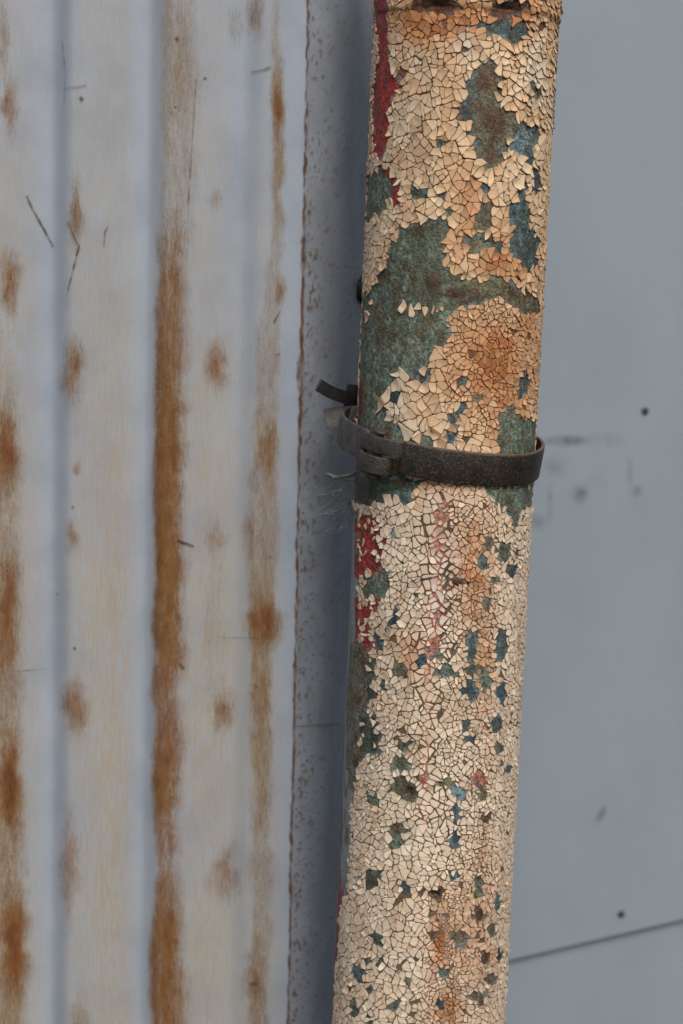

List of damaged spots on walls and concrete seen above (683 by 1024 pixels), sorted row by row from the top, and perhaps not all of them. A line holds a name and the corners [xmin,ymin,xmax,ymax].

corrosion [273,68,283,221]
peeling [354,0,550,454]
crack [357,0,564,454]
corrosion [0,733,22,831]
corrosion [0,874,29,1002]
corrosion [150,242,186,1024]
corrosion [286,0,325,1024]
peeling [347,916,390,1024]
peeling [358,866,415,901]
crack [332,475,535,1024]
peeling [346,450,533,855]
peeling [427,867,507,1011]